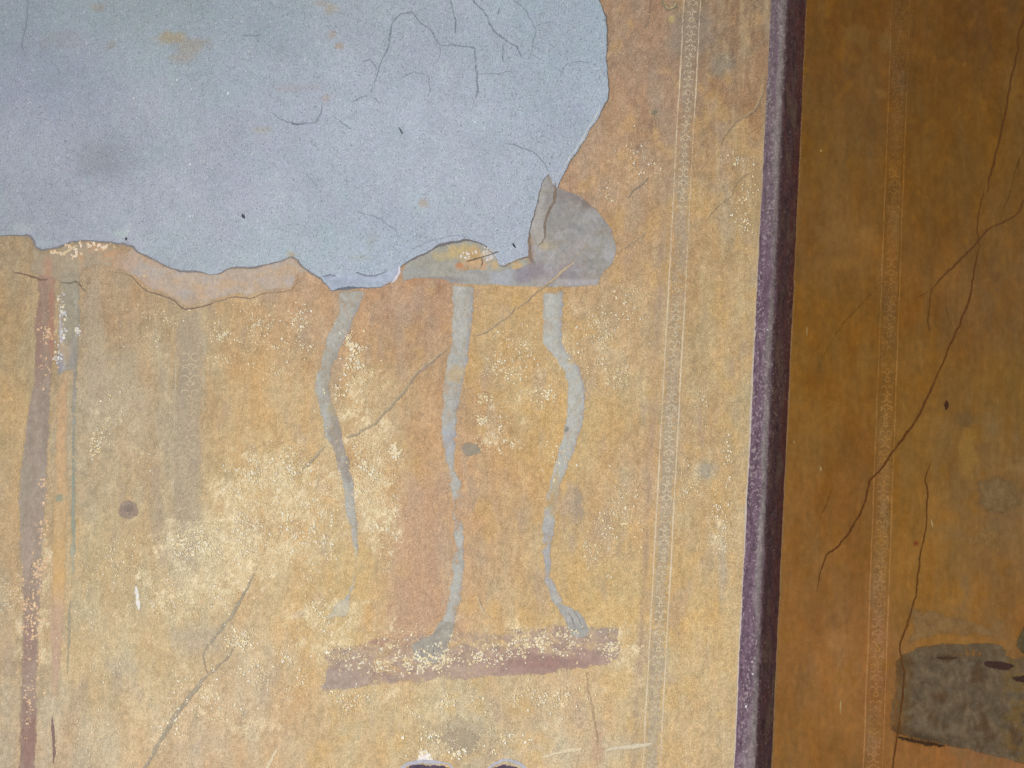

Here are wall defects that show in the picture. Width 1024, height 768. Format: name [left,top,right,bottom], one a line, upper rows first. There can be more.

crack [271,0,561,129]
crack [816,20,1024,592]
crack [143,349,447,768]
crack [892,461,932,768]